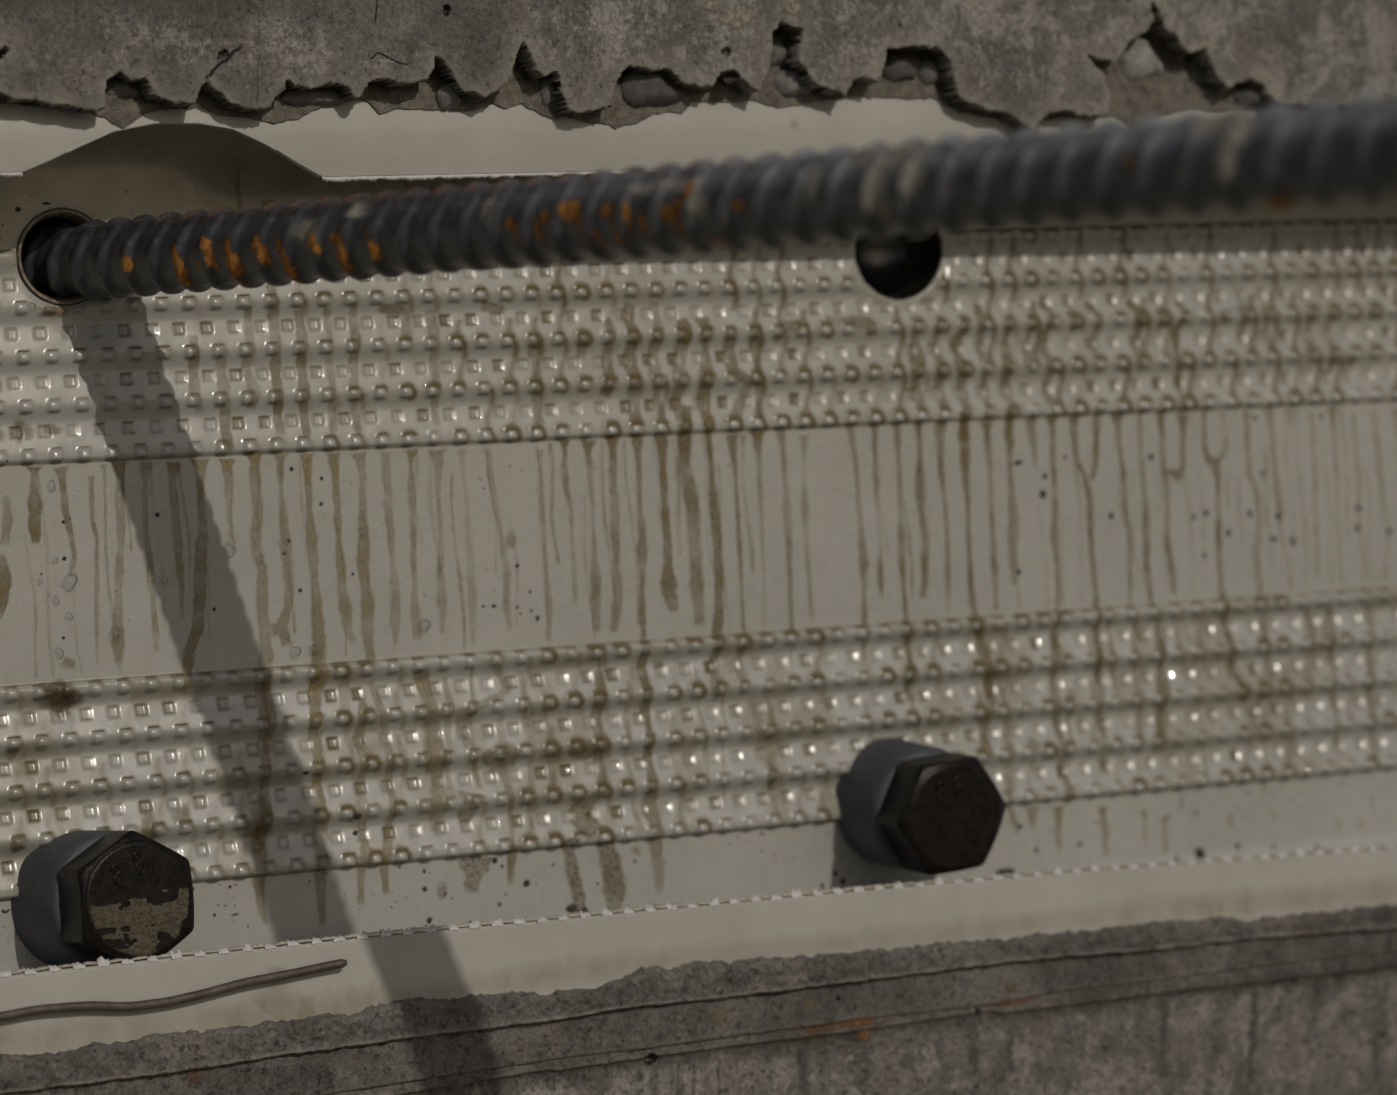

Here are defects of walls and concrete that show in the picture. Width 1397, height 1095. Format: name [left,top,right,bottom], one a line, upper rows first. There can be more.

spalling [0,24,1273,129]
corrosion [171,235,305,287]
corrosion [271,353,310,433]
corrosion [909,304,1014,401]
corrosion [0,567,11,611]
corrosion [28,493,42,542]
corrosion [167,423,284,504]
corrosion [301,453,374,617]
corrosion [560,310,784,678]
corrosion [872,400,1125,756]
corrosion [308,598,329,803]
corrosion [637,660,658,821]